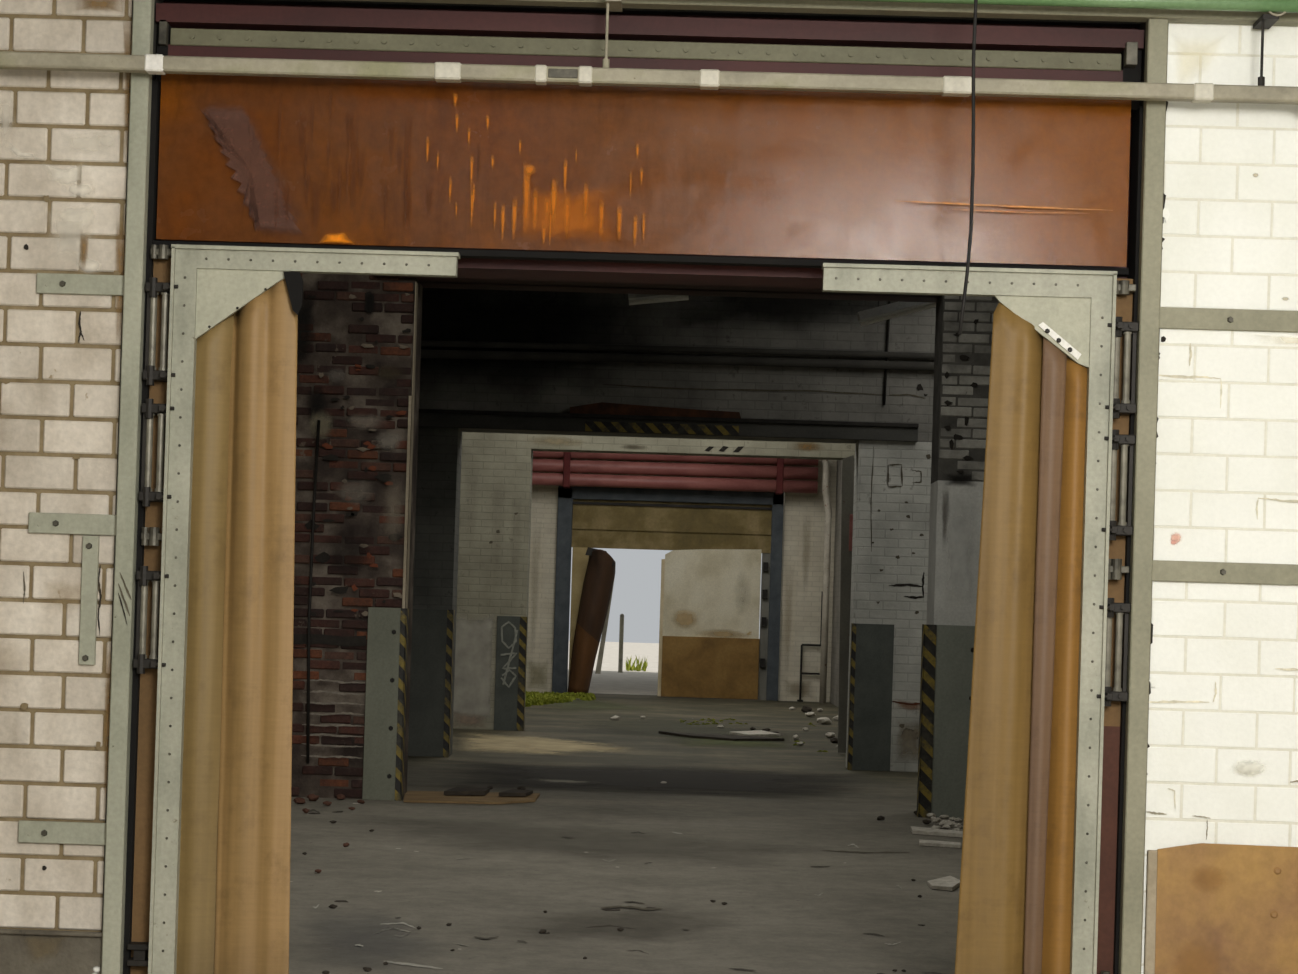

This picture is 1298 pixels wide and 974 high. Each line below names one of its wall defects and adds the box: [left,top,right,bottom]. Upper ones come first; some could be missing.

rust [449,161,475,218]
rust [494,153,645,240]
rust [323,234,349,242]